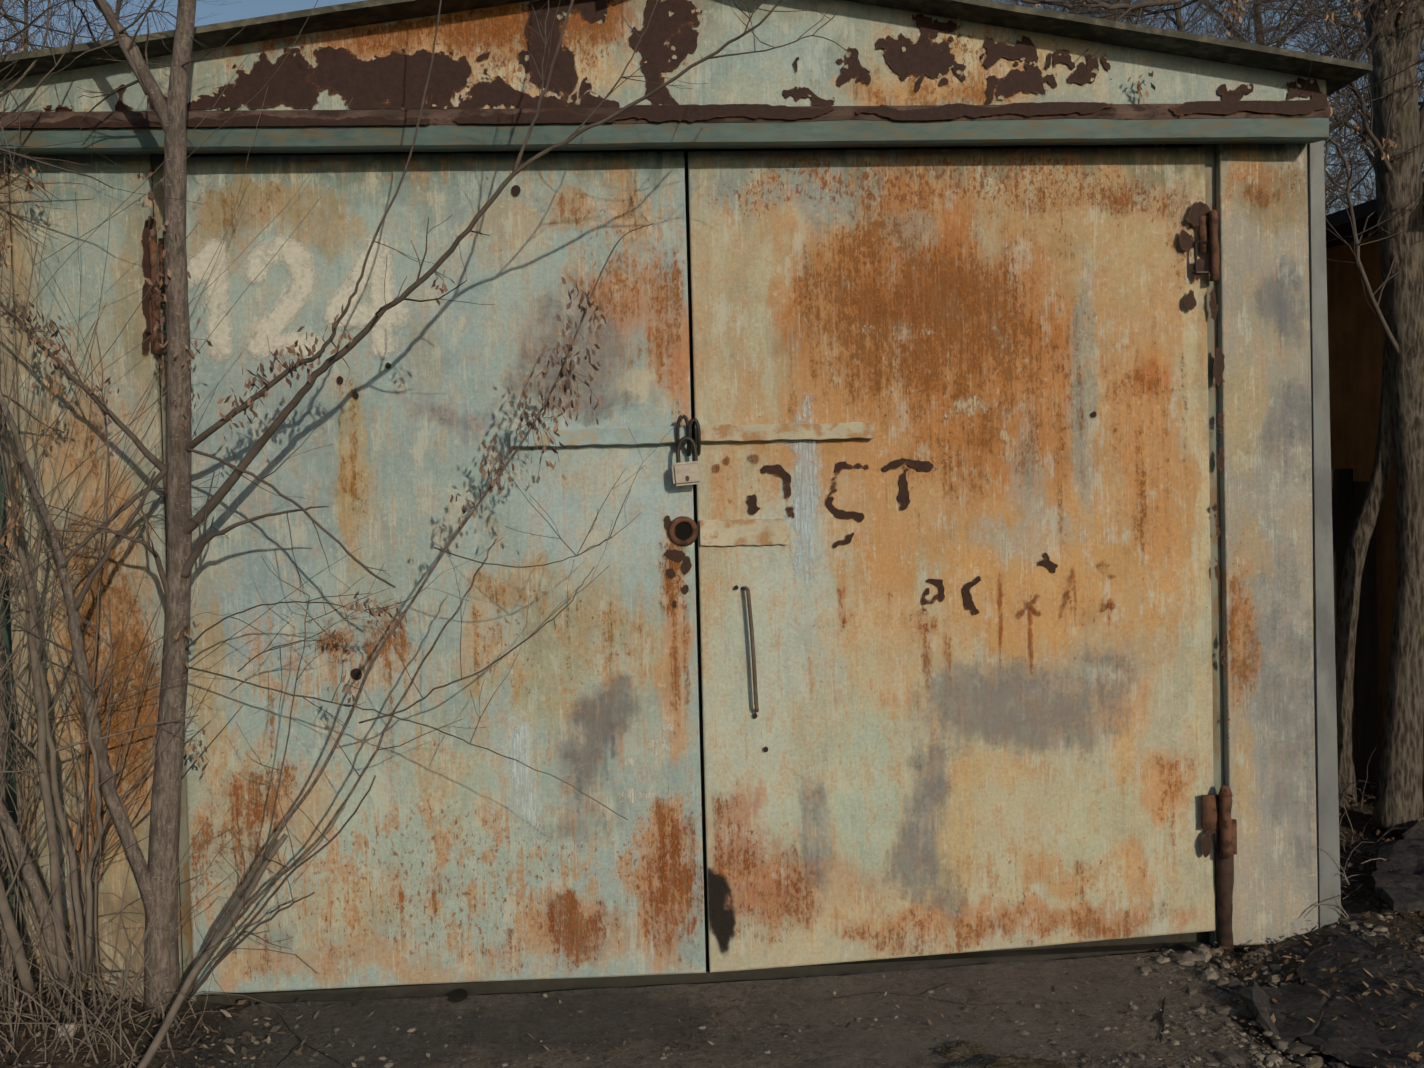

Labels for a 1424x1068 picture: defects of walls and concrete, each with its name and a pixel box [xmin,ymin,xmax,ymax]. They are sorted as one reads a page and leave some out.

peeling [0,84,167,128]
peeling [186,0,871,127]
peeling [855,14,1114,120]
peeling [1171,77,1328,116]
rust [569,230,689,425]
rust [793,176,1096,499]
rust [42,500,160,861]
rust [317,604,411,713]
rust [192,695,297,905]
rust [540,889,619,968]
rust [638,797,821,963]
rust [845,862,1171,955]